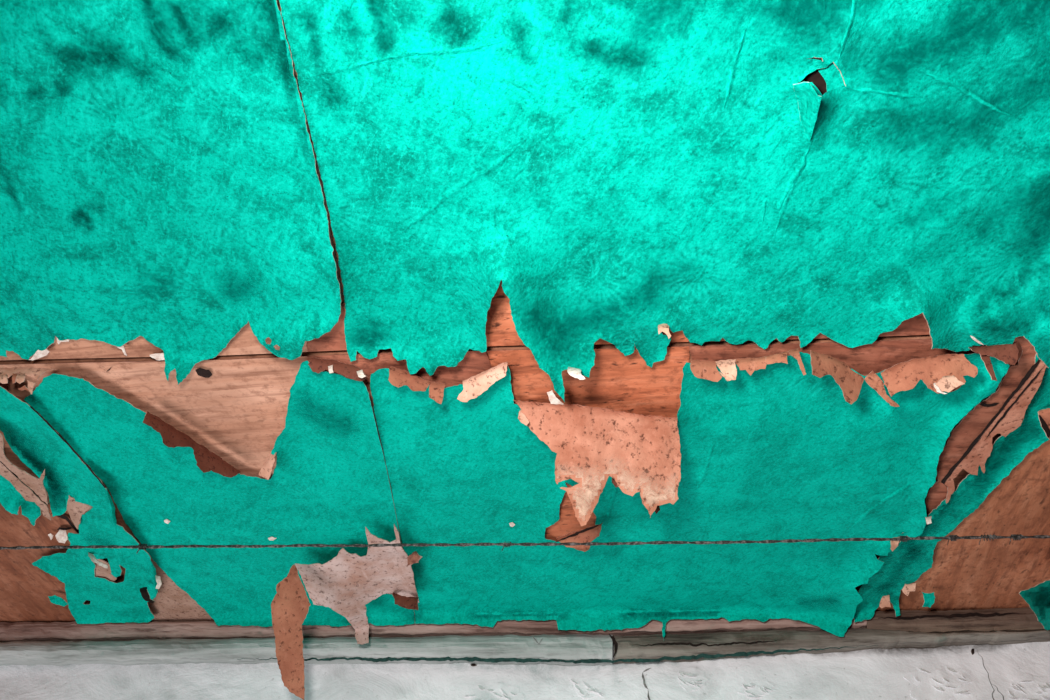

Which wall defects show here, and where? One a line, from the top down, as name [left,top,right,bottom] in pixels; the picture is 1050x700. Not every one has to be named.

water stain [67,49,116,68]
water stain [143,0,174,54]
water stain [266,0,289,68]
crack [294,71,342,295]
peeling [0,280,1050,623]
peeling [271,524,422,700]